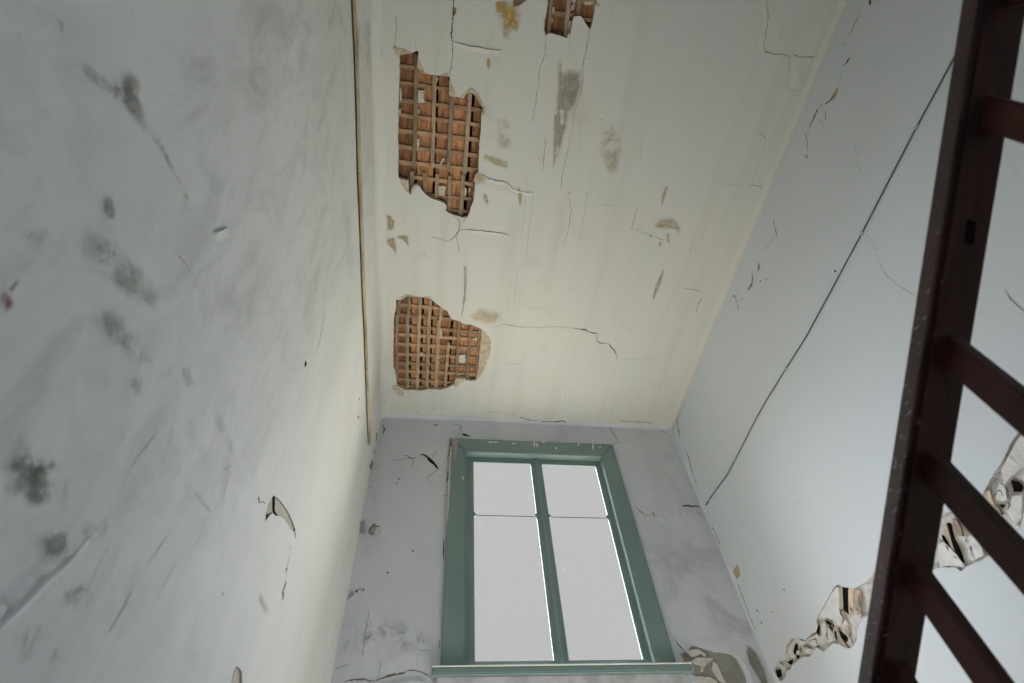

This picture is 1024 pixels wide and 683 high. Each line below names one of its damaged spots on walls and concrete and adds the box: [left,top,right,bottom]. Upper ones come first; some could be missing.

spalling [543,0,601,38]
spalling [394,47,487,218]
damp [554,75,578,161]
crack [759,0,871,159]
crack [433,30,664,366]
spalling [392,294,491,397]
crack [368,409,461,501]
flaking render [994,435,1024,526]
flaking render [938,535,987,568]
flaking render [684,646,747,683]
flaking render [788,587,850,658]